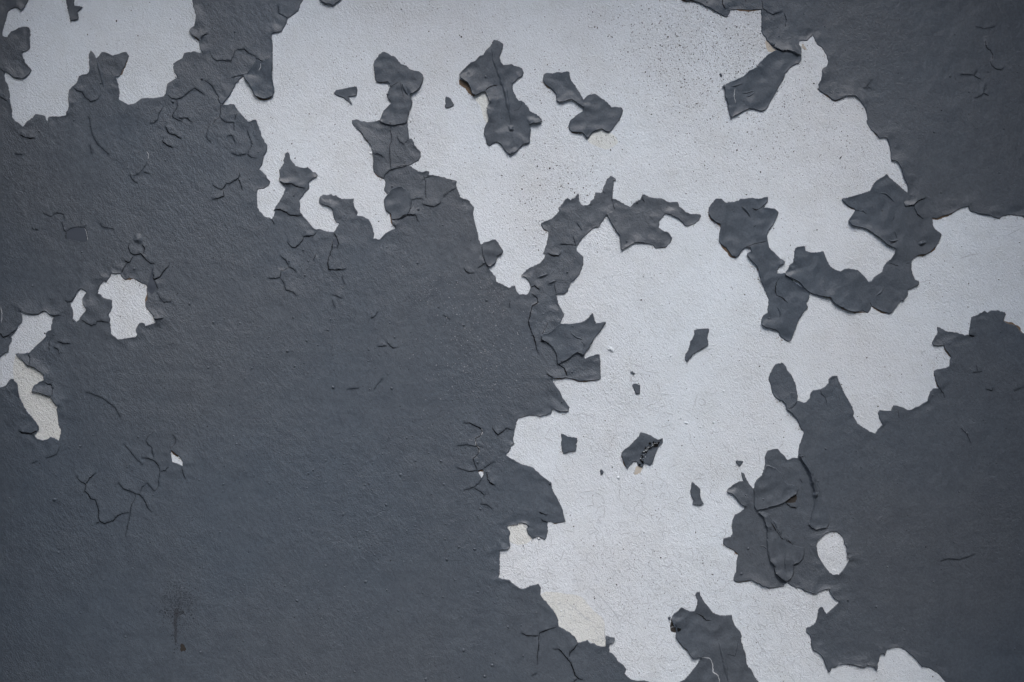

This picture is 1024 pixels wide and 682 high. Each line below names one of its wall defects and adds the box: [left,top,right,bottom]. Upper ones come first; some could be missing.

peeling [2,0,207,126]
crack [150,34,261,200]
peeling [0,299,62,387]
peeling [70,273,156,339]
peeling [223,0,1024,682]
crack [79,432,185,536]
crack [458,423,511,508]
crack [506,346,834,682]